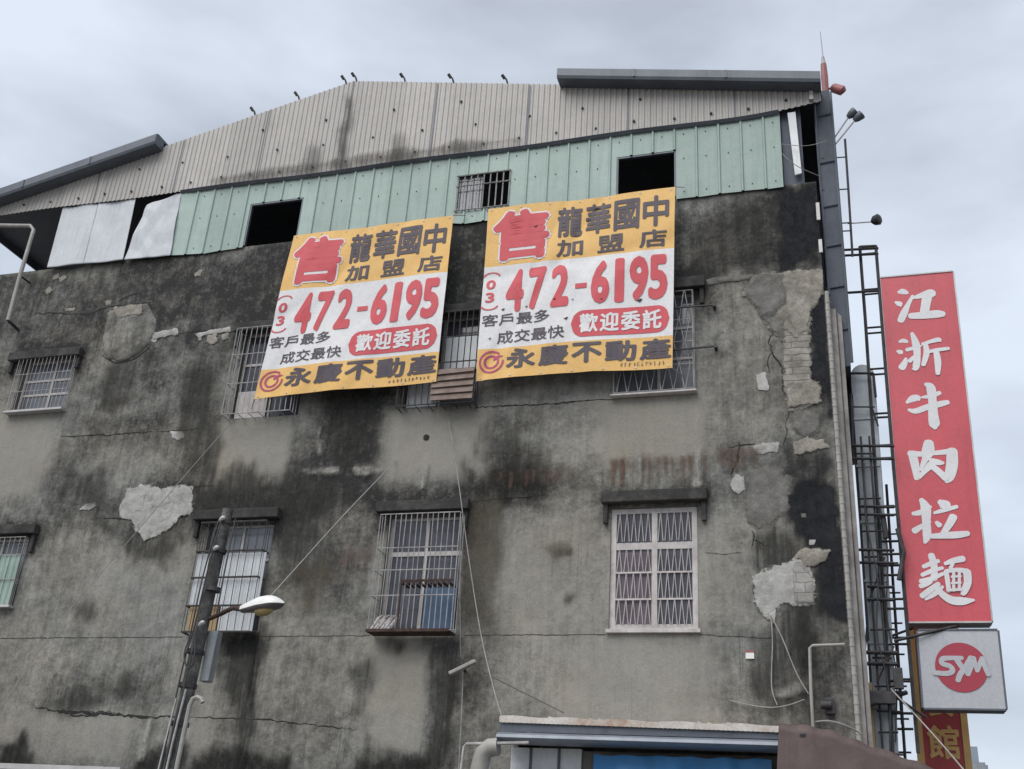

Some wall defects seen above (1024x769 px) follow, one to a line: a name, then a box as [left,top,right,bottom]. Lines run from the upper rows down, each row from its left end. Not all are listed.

spalling [151,328,178,342]
spalling [196,327,231,345]
crack [767,334,790,446]
flaking render [742,268,830,455]
spalling [119,483,194,541]
damp [125,368,381,607]
spalling [730,474,746,494]
spalling [752,540,831,624]
crack [35,707,355,730]